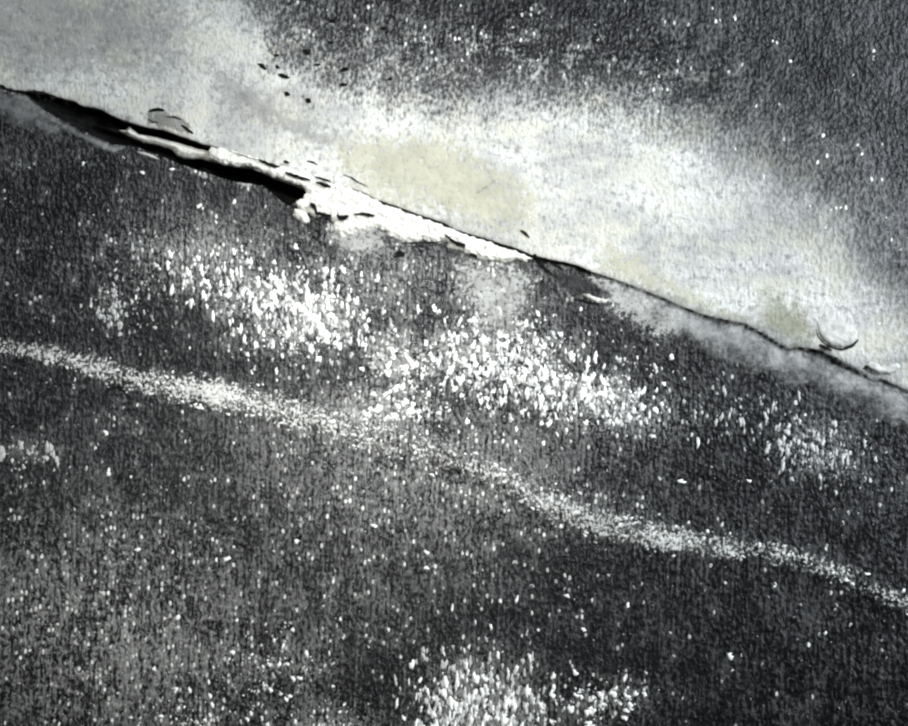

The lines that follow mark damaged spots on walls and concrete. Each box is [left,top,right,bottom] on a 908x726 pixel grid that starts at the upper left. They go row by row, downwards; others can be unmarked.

spalling [147,108,193,134]
spalling [208,147,532,263]
crack [230,151,877,379]